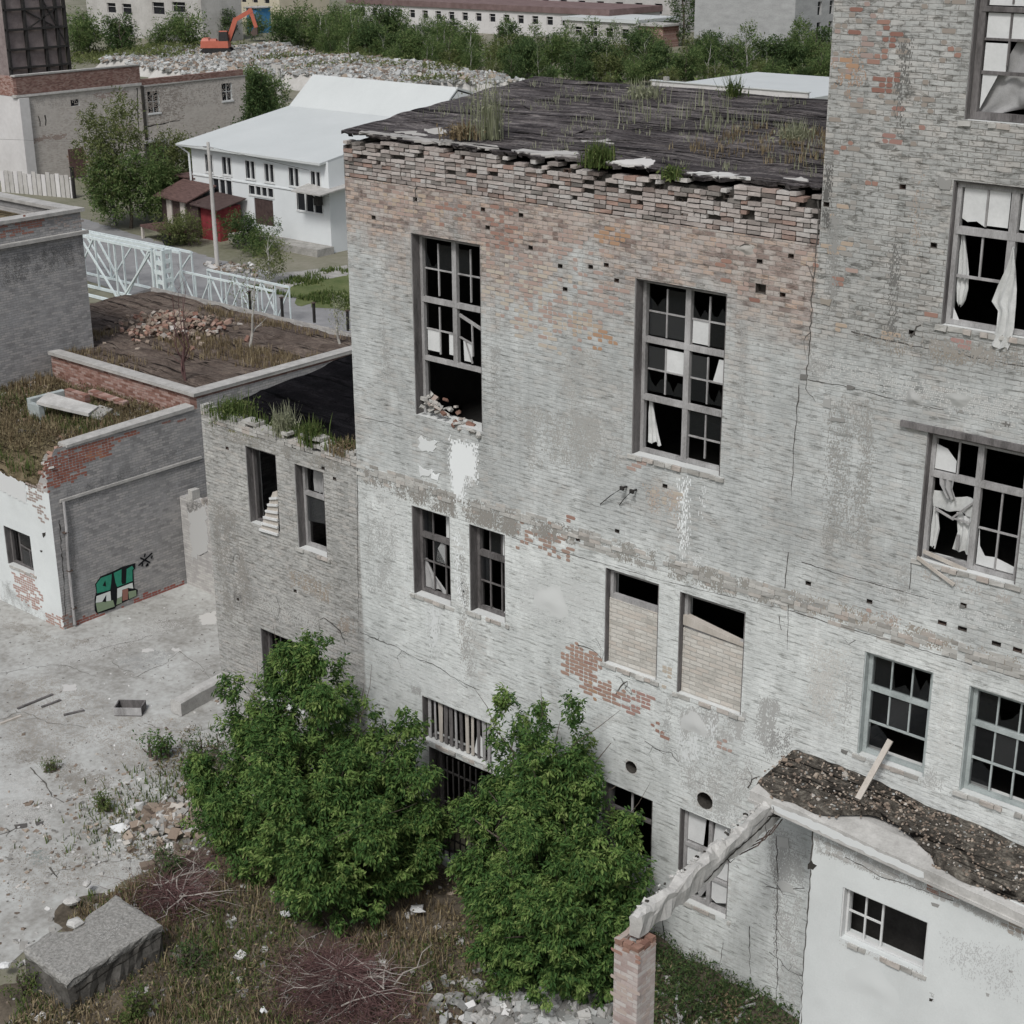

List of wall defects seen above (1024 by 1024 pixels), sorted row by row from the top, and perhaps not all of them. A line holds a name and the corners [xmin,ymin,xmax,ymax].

crack [791,199,943,495]
spalling [11,572,105,630]
spalling [0,430,140,552]
crack [319,468,479,690]
spalling [514,515,580,562]
spalling [561,642,672,715]
crack [704,807,814,1024]